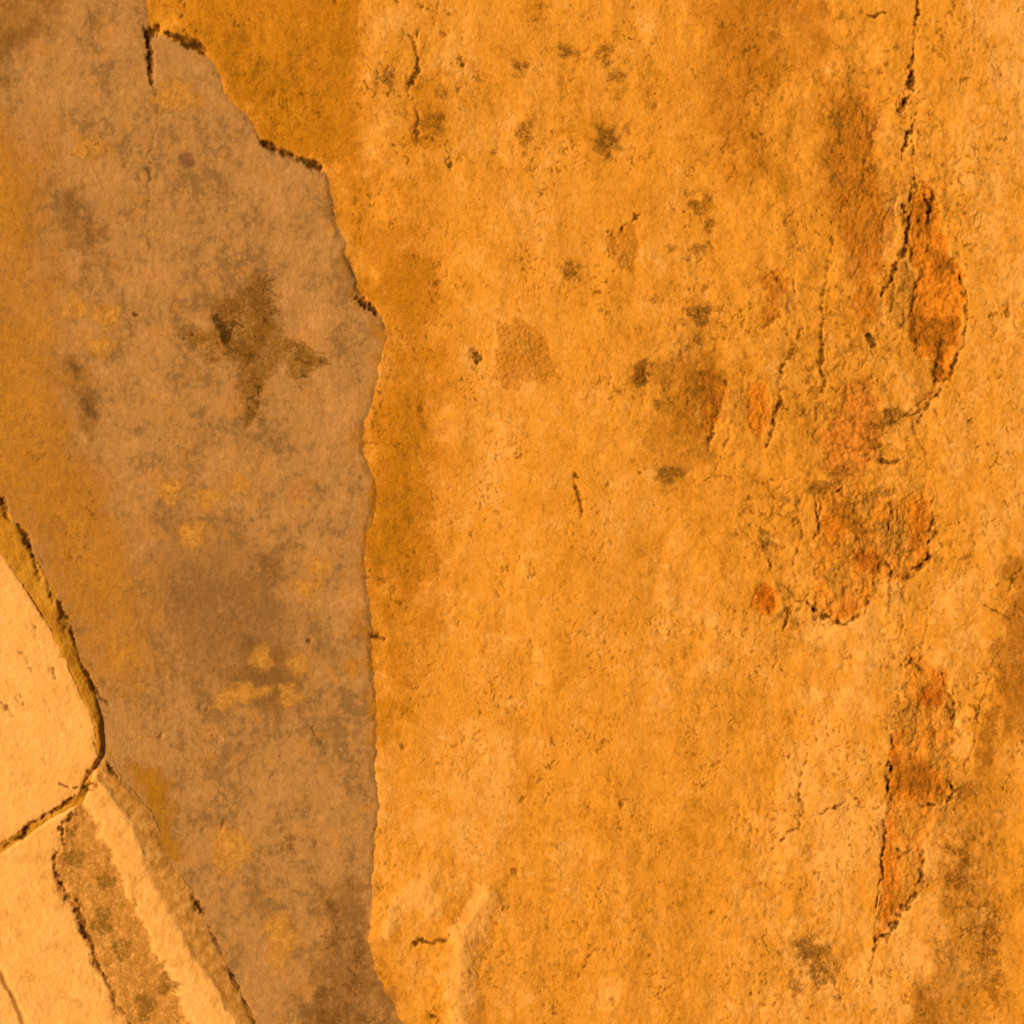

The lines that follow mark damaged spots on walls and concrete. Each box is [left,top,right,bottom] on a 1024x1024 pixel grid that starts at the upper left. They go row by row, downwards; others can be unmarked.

crack [881,50,935,311]
water stain [183,276,327,425]
crack [1,498,34,556]
crack [5,743,118,846]
spalling [53,804,187,1024]
crack [196,901,217,942]
crack [228,969,255,1022]